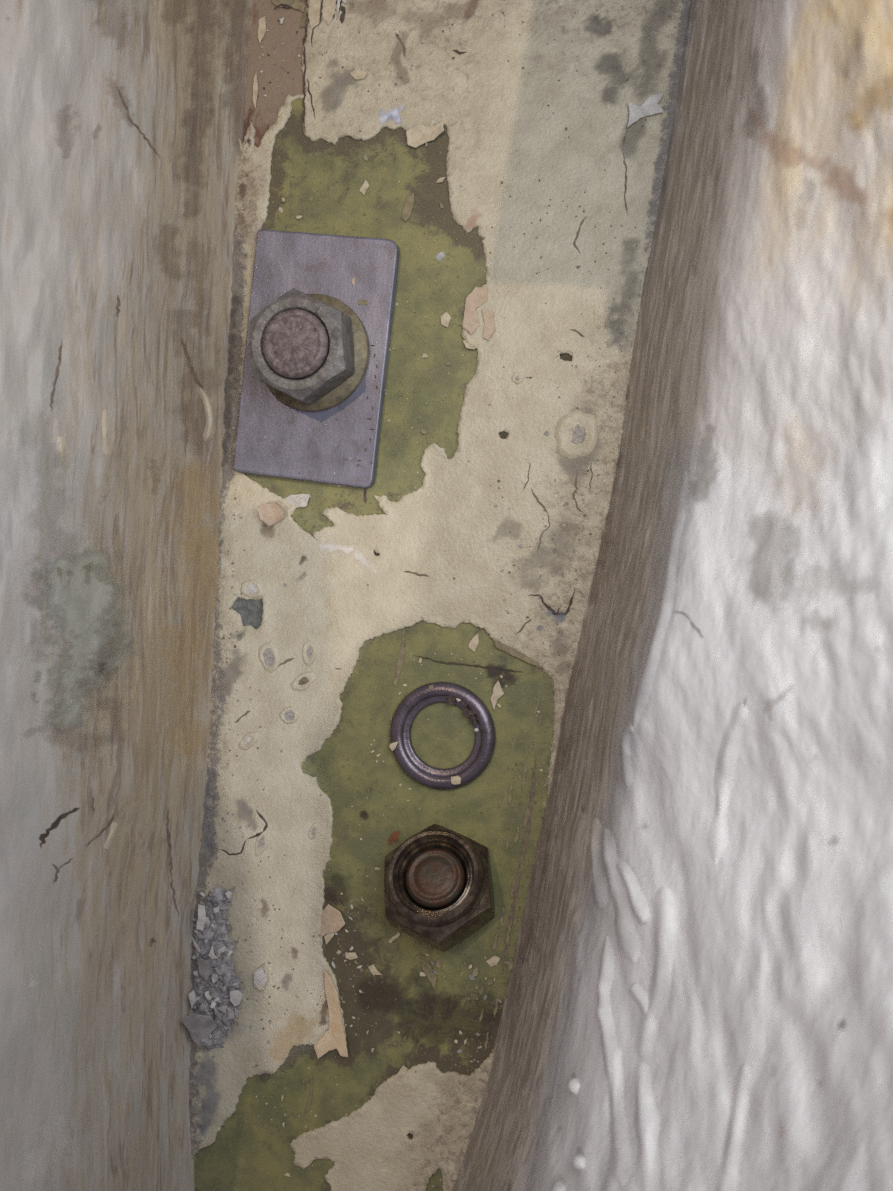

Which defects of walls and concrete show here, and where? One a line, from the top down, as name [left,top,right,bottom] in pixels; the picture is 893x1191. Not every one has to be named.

peeling [243,0,496,536]
crack [524,465,550,553]
crack [573,463,593,512]
spalling [231,597,263,629]
crack [516,588,575,634]
crack [39,797,114,883]
crack [220,810,267,855]
peeling [194,620,555,1191]
spalling [181,887,243,1052]